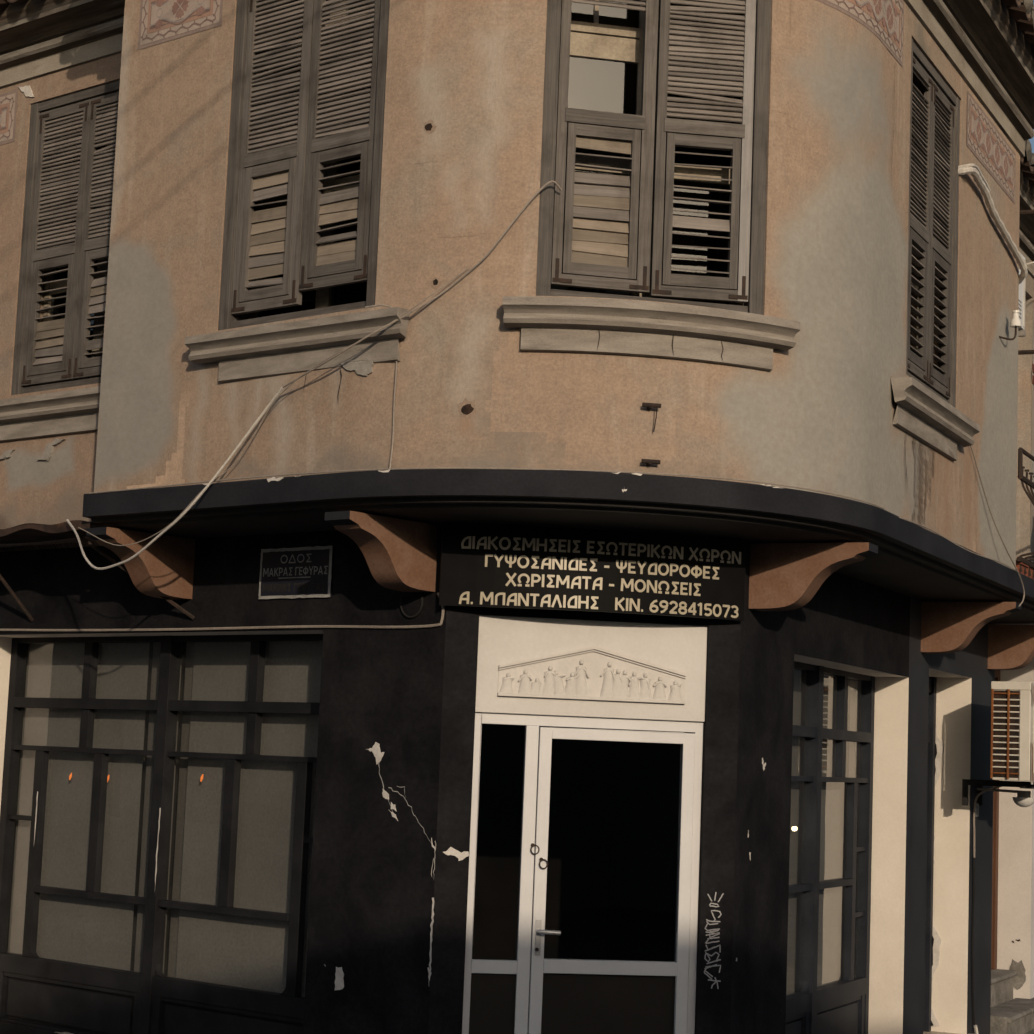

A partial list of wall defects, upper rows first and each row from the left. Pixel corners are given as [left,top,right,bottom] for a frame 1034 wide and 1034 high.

leakage [912,437,976,551]